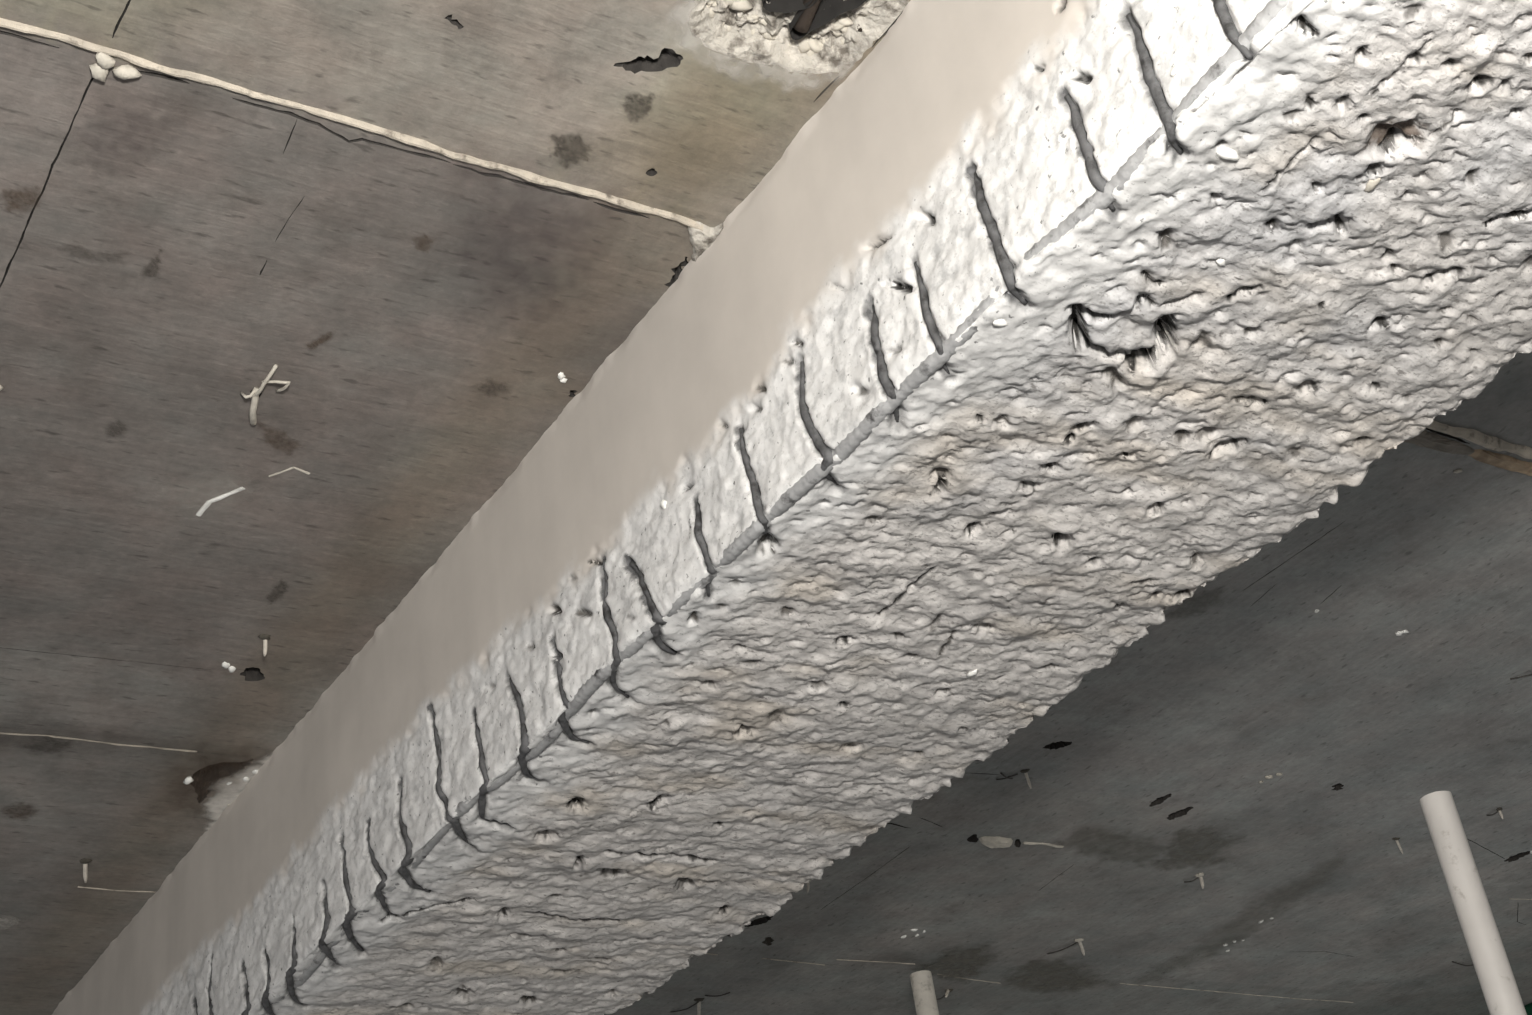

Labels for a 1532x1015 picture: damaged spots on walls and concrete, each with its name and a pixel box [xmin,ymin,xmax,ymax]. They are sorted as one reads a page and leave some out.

crack [112,0,131,38]
spalling [1467,75,1509,88]
crack [0,77,94,288]
spalling [1440,232,1451,250]
spalling [1374,316,1389,329]
spalling [241,0,1319,1015]
spalling [183,756,271,830]
spalling [193,955,214,1015]